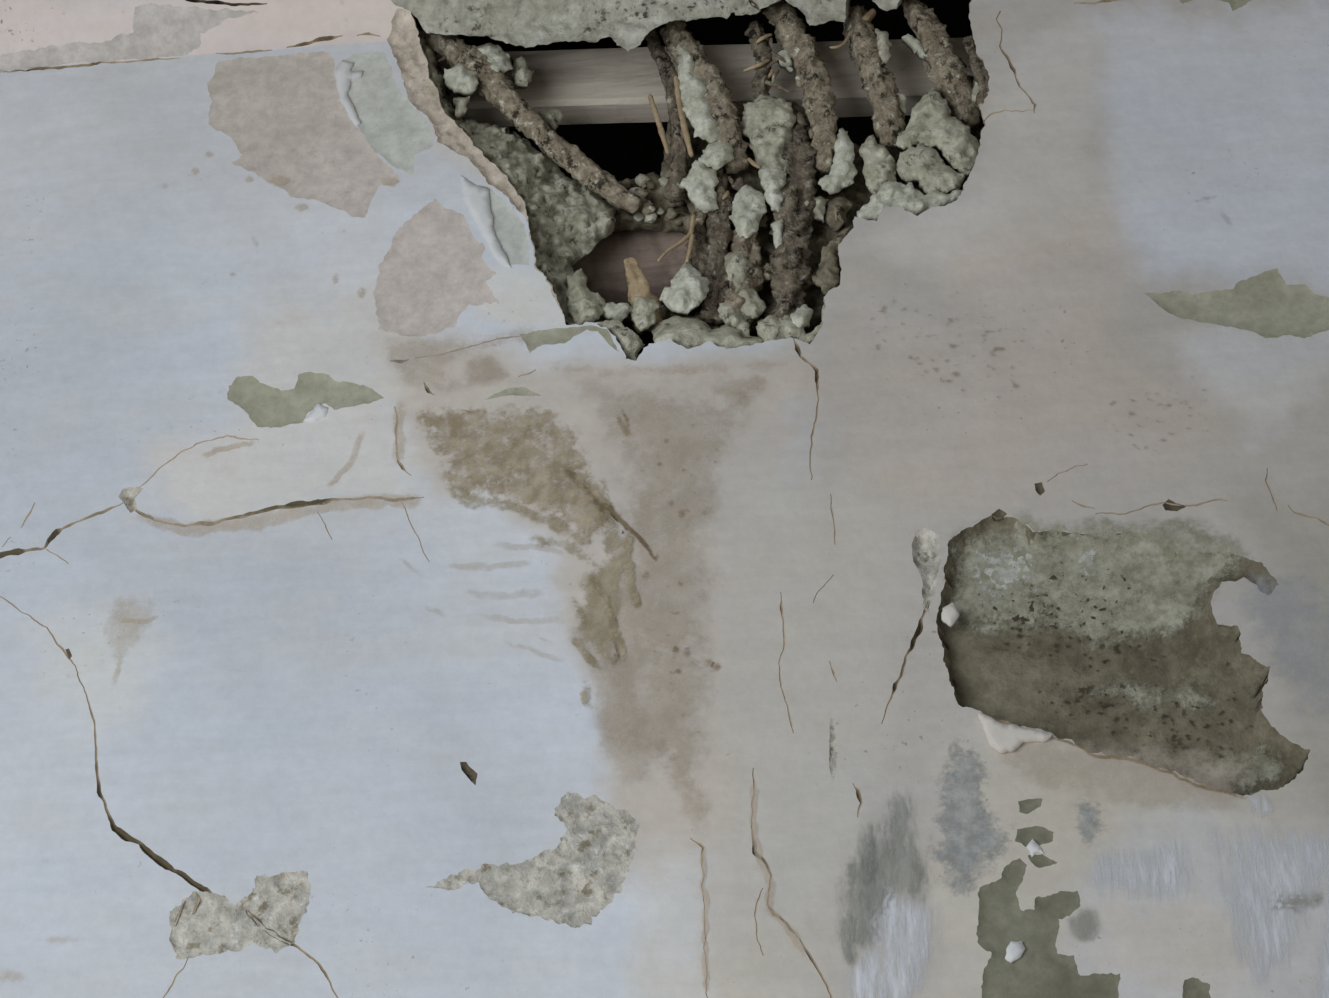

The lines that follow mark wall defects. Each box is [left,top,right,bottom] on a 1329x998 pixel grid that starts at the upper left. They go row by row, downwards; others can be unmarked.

crack [186,0,267,8]
spalling [207,0,851,353]
spalling [802,143,878,334]
crack [0,407,430,564]
damp [418,398,716,771]
spalling [912,499,1310,796]
crack [0,596,212,998]
crack [245,909,338,998]
spalling [427,792,640,928]
crack [751,768,833,998]
mould [842,744,1005,960]
peeling [976,798,1121,998]